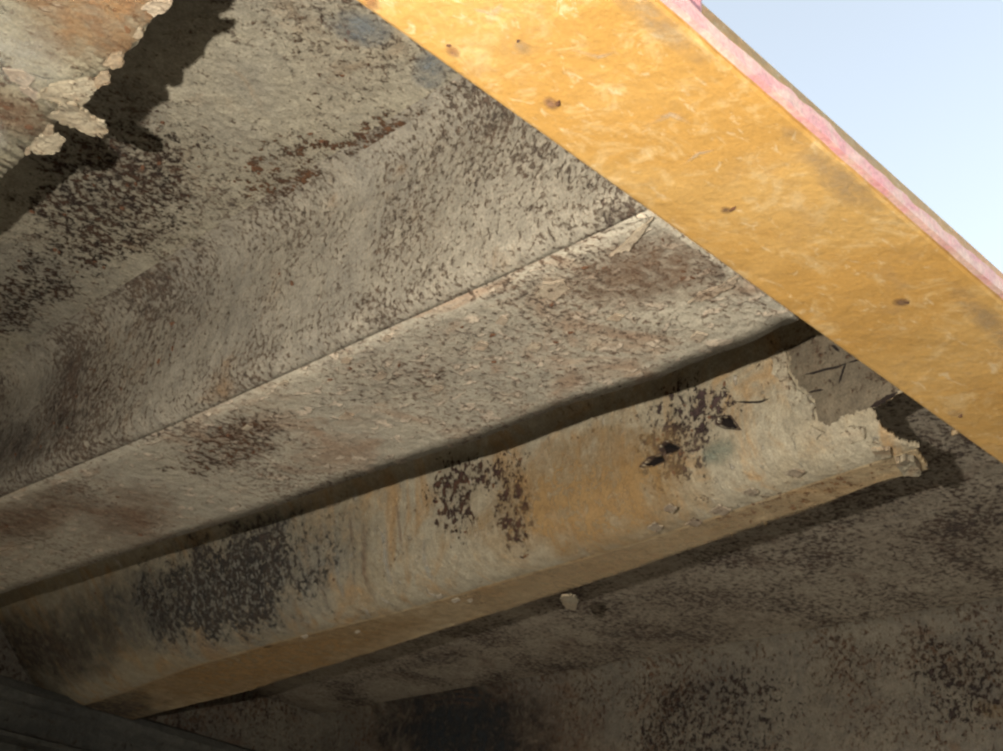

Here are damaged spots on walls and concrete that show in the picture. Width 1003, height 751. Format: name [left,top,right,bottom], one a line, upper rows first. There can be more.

peeling [141,0,173,17]
peeling [3,51,124,156]
corrosion [0,3,436,345]
corrosion [636,369,743,504]
spalling [770,333,921,478]
corrosion [421,450,535,559]
water stain [78,524,331,645]
water stain [379,683,542,751]